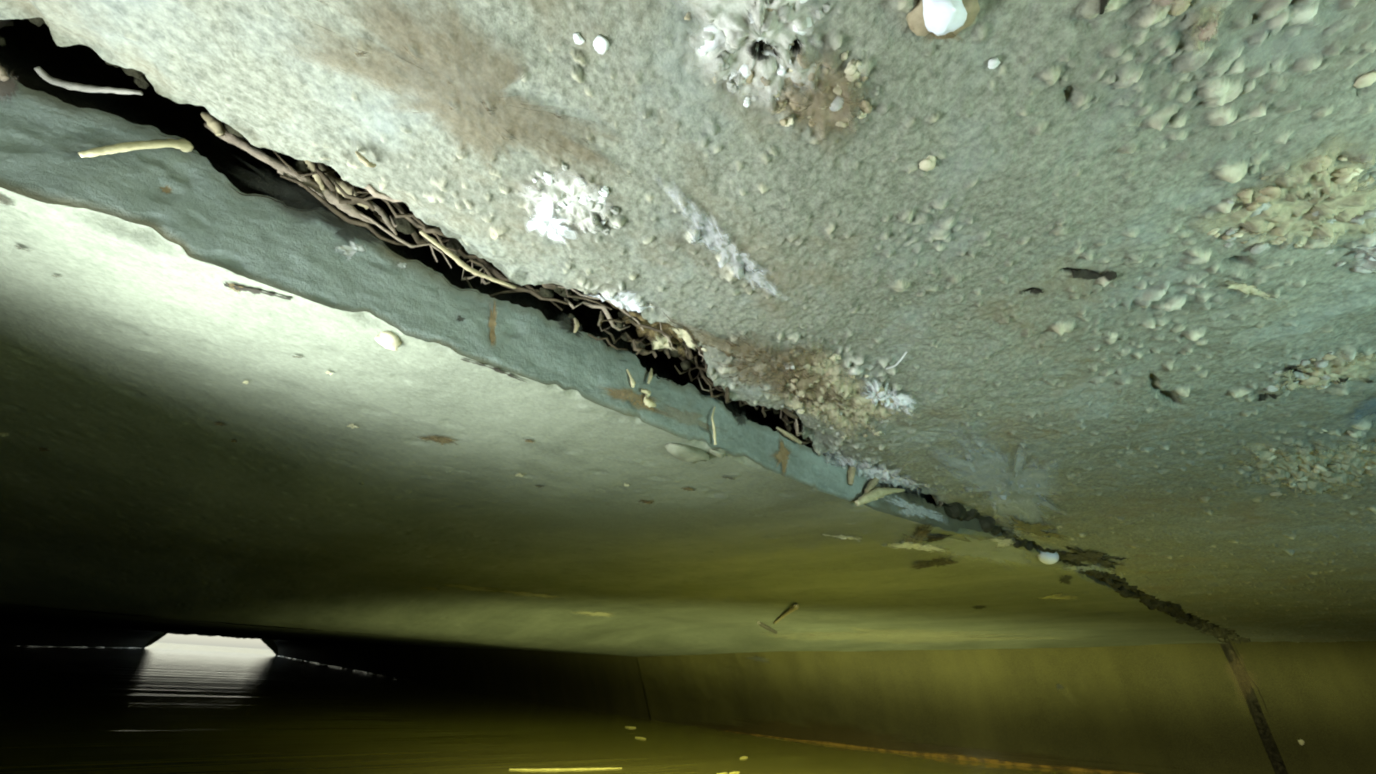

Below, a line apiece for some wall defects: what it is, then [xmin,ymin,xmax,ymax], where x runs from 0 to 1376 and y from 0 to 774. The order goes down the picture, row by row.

crack [1099,0,1110,15]
crack [0,17,836,458]
efflorescence [527,203,575,240]
leakage [1325,246,1376,274]
crack [1021,267,1117,294]
efflorescence [864,381,916,411]
crack [1258,366,1373,401]
crack [880,482,1288,774]